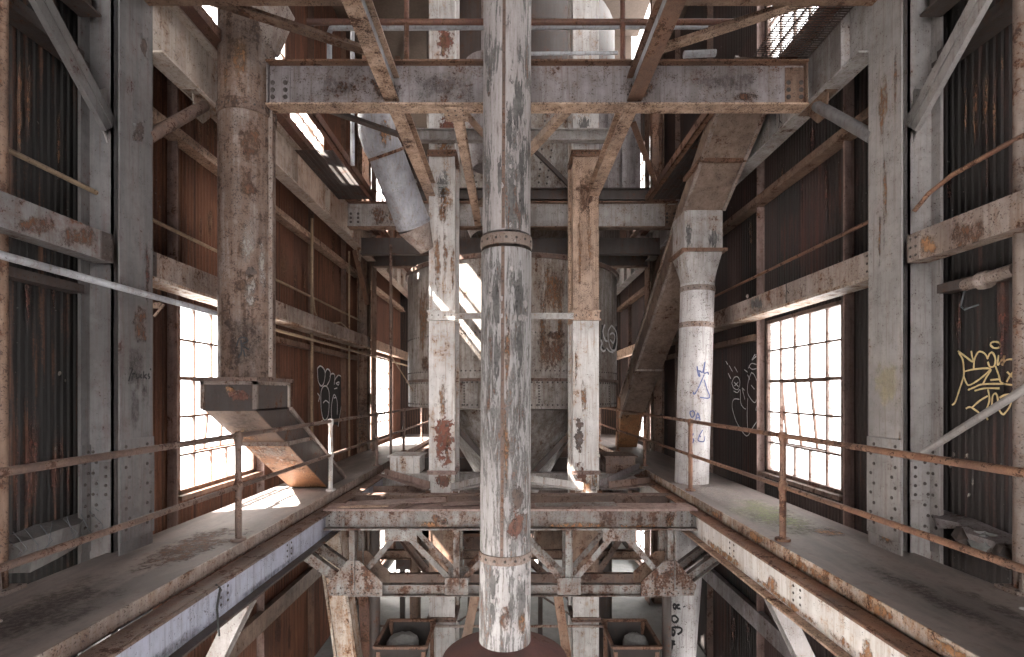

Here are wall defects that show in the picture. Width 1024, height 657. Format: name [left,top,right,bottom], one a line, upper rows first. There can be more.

rust [239,119,260,197]
rust [17,216,97,247]
rust [951,220,982,248]
peeling [489,261,528,381]
rust [537,267,565,369]
peeling [507,484,528,545]
peeling [489,569,530,628]
rust [757,576,814,624]
rust [834,635,873,657]